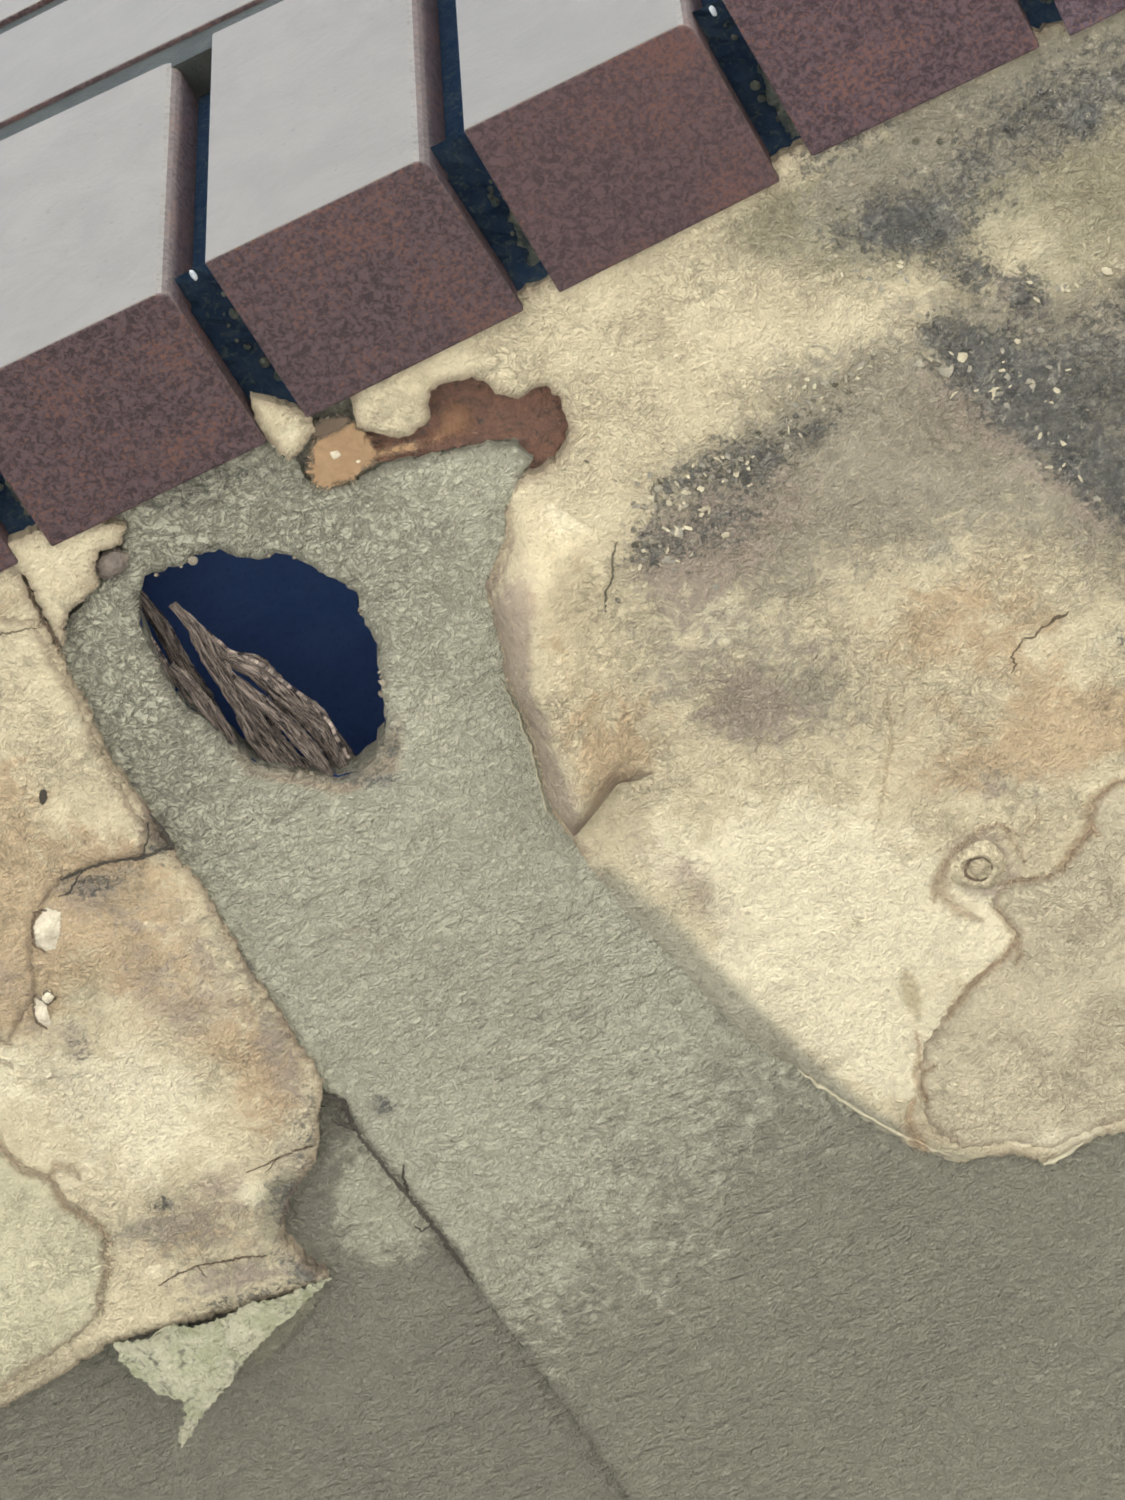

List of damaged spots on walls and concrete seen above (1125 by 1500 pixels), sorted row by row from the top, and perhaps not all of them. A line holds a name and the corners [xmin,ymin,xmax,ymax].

peeling [827,257,909,301]
peeling [775,361,872,450]
peeling [913,330,1071,409]
corrosion [306,408,469,490]
spalling [30,908,61,953]
spalling [57,377,1125,1500]
spalling [31,989,56,1030]
crack [158,1255,267,1286]